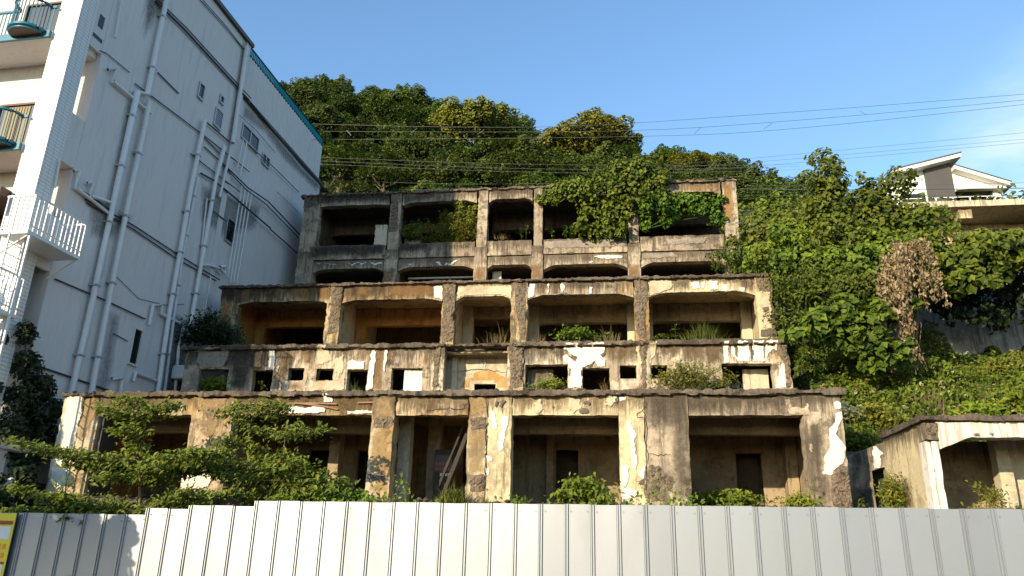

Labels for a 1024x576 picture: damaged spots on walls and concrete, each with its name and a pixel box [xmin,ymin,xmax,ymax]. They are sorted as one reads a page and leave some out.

peeling [279,284,393,428]
spalling [431,279,565,492]
peeling [563,342,605,413]
peeling [605,393,626,406]
peeling [723,273,852,508]
spalling [367,473,386,483]
spalling [621,421,691,503]